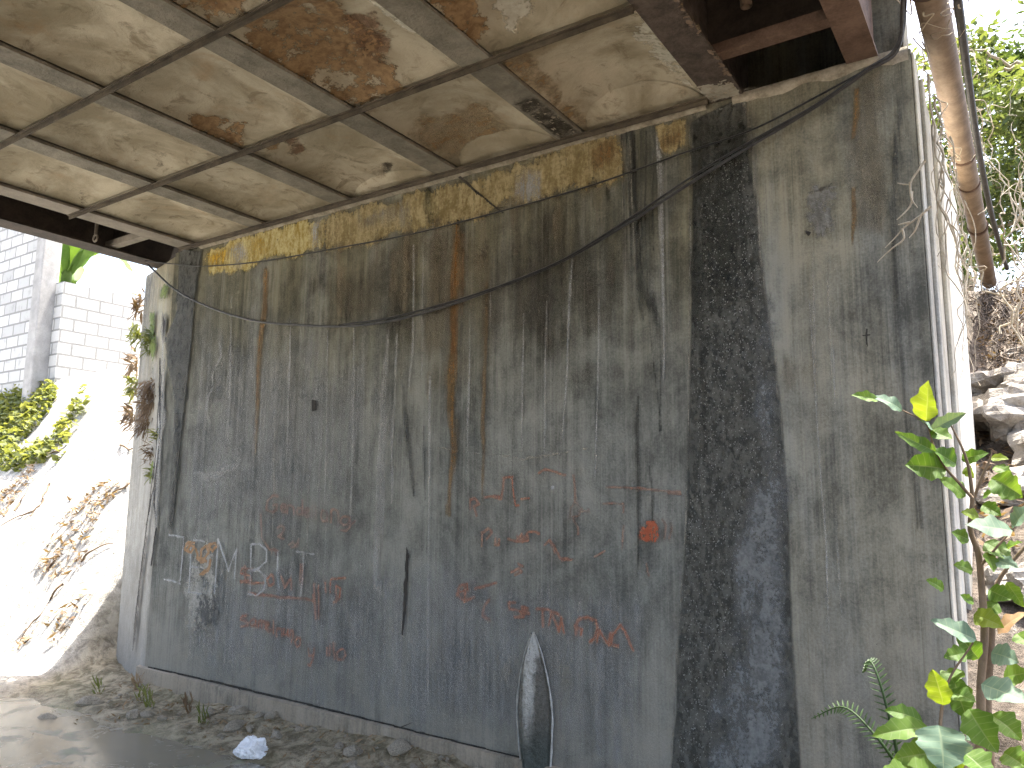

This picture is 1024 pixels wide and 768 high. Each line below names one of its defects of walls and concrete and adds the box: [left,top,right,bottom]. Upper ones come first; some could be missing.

crack [132,333,522,758]
rust [447,220,464,516]
water stain [161,23,800,768]